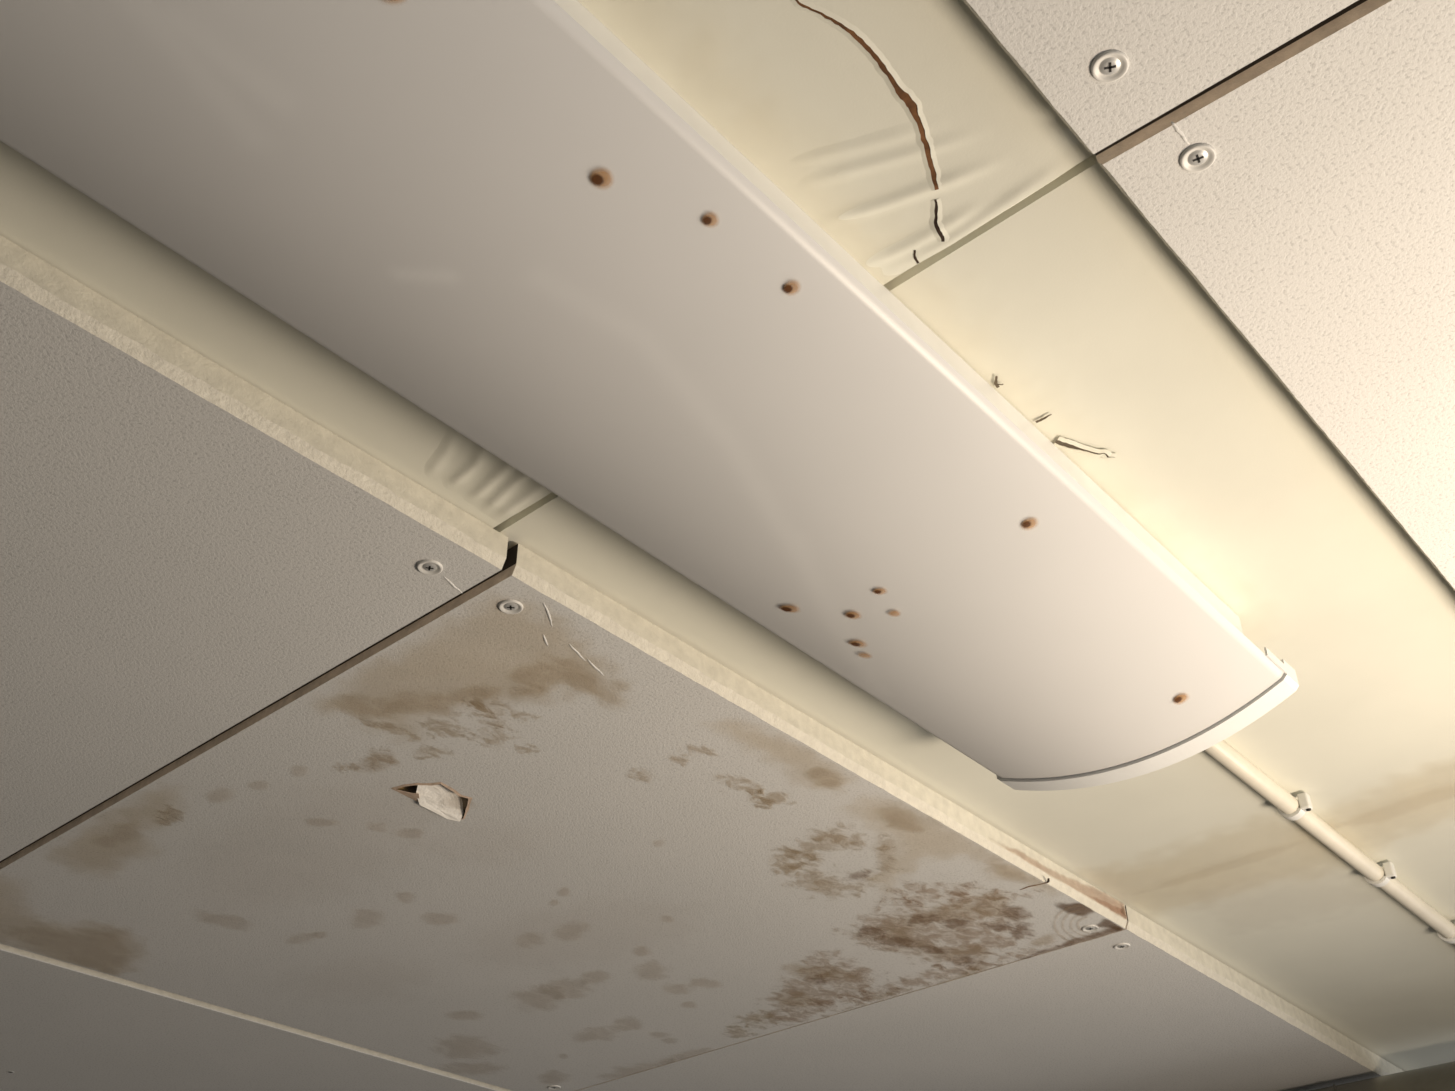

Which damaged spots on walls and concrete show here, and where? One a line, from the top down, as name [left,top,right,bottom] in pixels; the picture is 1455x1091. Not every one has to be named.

crack [790,0,950,264]
crack [1035,414,1118,460]
spalling [397,785,418,793]